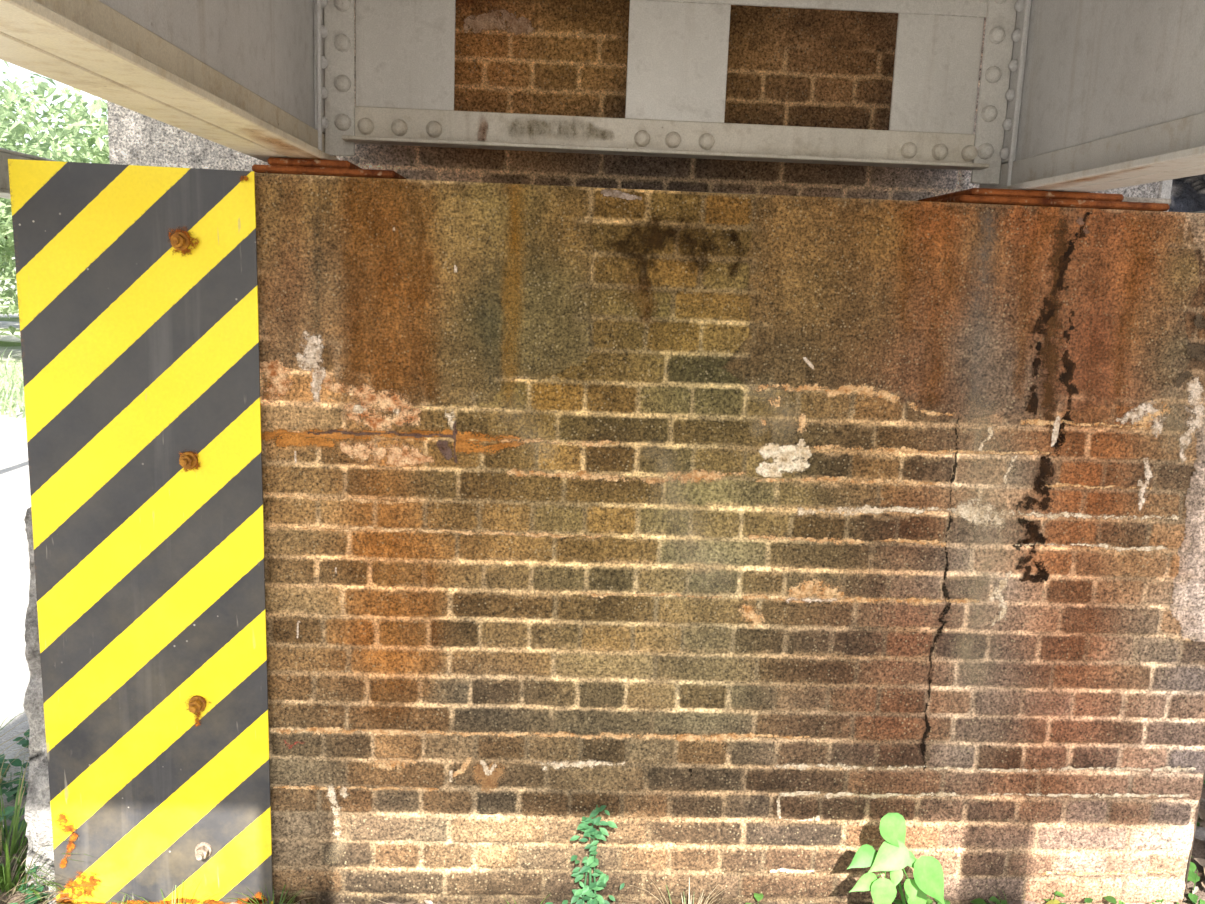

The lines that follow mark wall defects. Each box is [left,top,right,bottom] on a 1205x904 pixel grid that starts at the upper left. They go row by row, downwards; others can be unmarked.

corrosion [261,422,526,463]
damp [607,217,717,317]
damp [729,231,744,277]
crack [920,410,960,770]
peeling [722,194,1205,642]
crack [1012,212,1090,583]